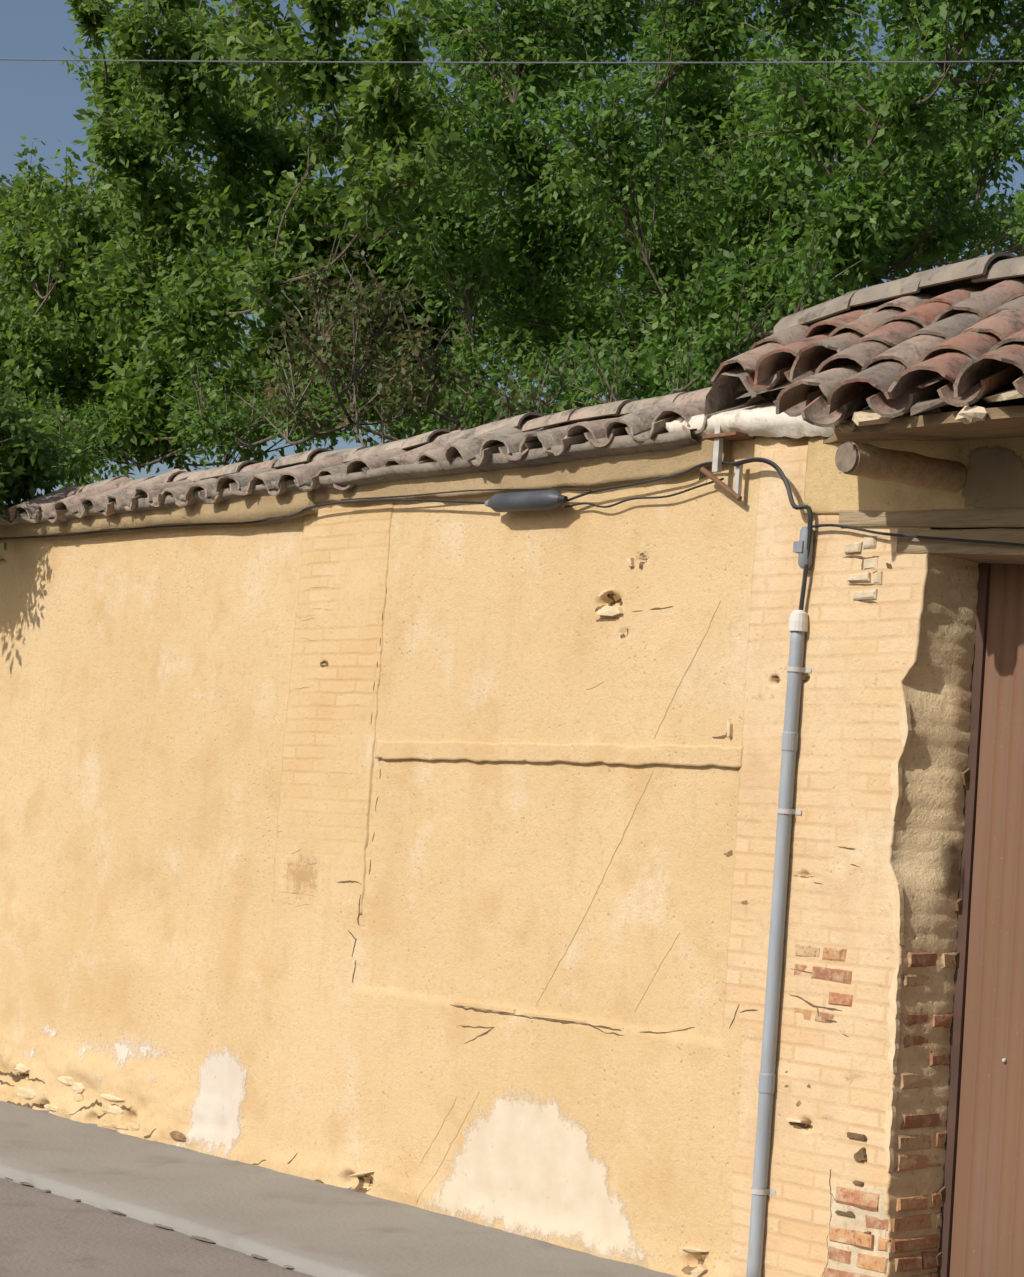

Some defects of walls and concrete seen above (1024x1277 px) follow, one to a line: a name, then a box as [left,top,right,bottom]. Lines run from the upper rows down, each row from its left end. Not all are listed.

spalling [595,589,628,639]
crack [654,600,721,739]
flaking render [890,701,912,820]
crack [450,772,694,1044]
spalling [9,1049,58,1112]
spalling [169,1131,187,1142]
leakage [176,1047,247,1158]
crack [416,1093,479,1205]
crack [729,1004,758,1029]
flaking render [846,1132,868,1162]
flaking render [883,885,960,1172]
flaking render [824,1180,946,1277]